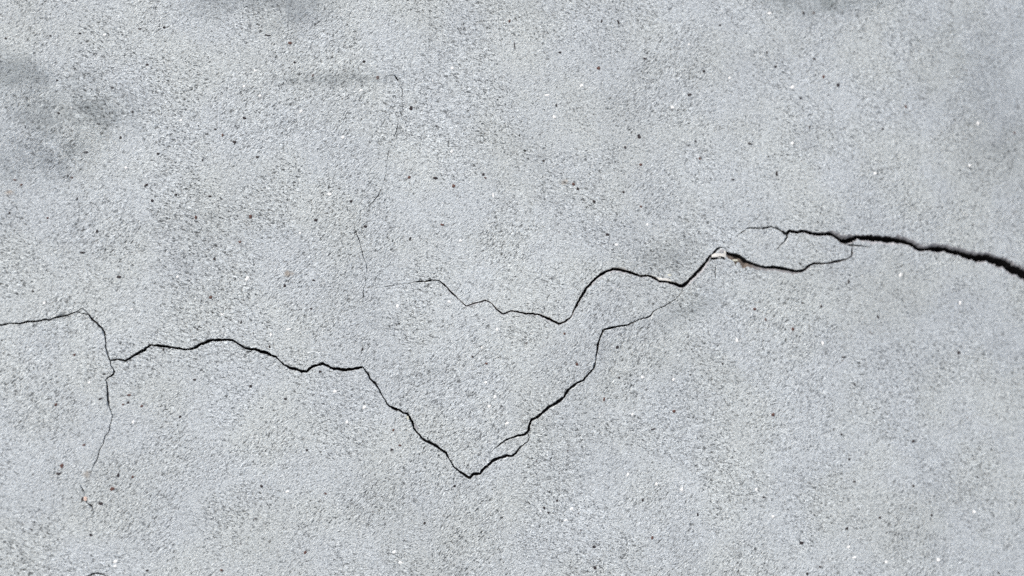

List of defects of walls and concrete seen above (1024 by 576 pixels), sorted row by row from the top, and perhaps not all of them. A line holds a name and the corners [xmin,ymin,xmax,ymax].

crack [0,74,1024,519]